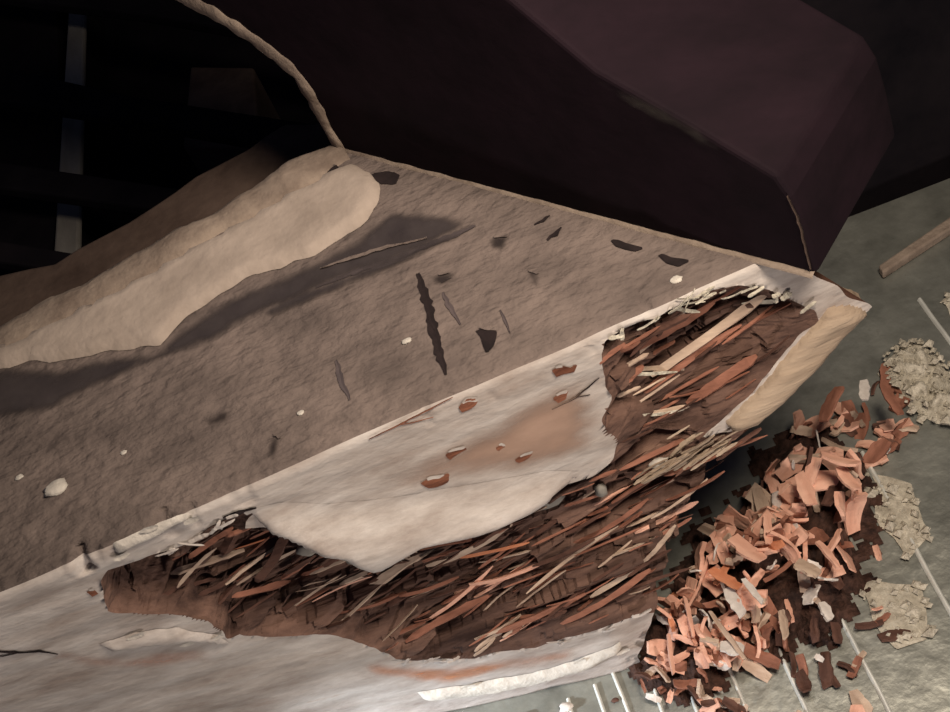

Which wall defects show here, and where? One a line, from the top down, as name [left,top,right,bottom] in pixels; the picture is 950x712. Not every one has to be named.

leakage [0,215,458,414]
crack [316,225,476,375]
crack [335,360,350,400]
crack [369,397,453,439]
spalling [87,285,819,666]
crack [0,649,58,657]
peeling [417,642,630,701]